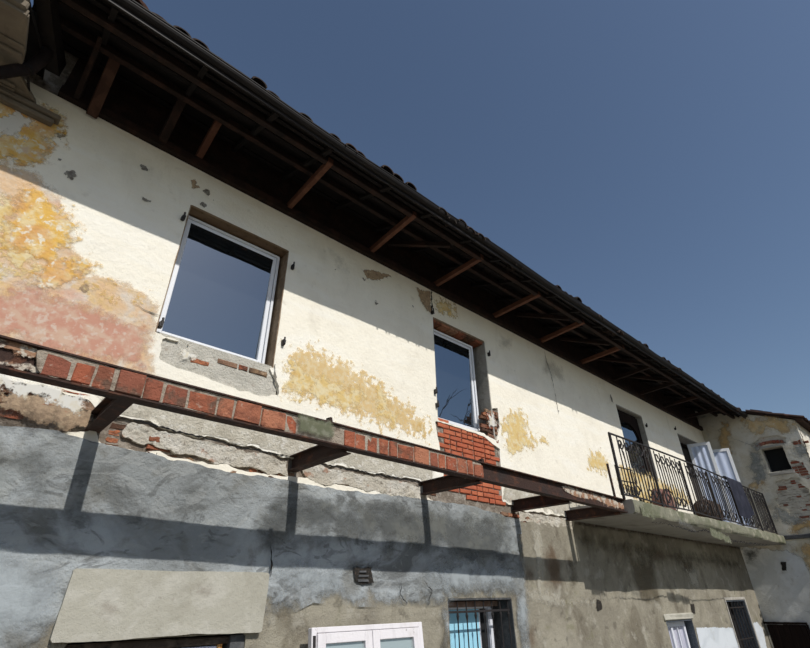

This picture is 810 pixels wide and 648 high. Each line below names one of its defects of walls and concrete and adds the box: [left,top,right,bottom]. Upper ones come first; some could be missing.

spalling [24,2,42,62]
peeling [0,103,432,445]
spalling [105,404,436,500]
peeling [478,408,548,455]
spalling [500,485,624,530]
peeling [588,451,608,478]
peeling [619,464,689,506]
spalling [778,461,810,533]